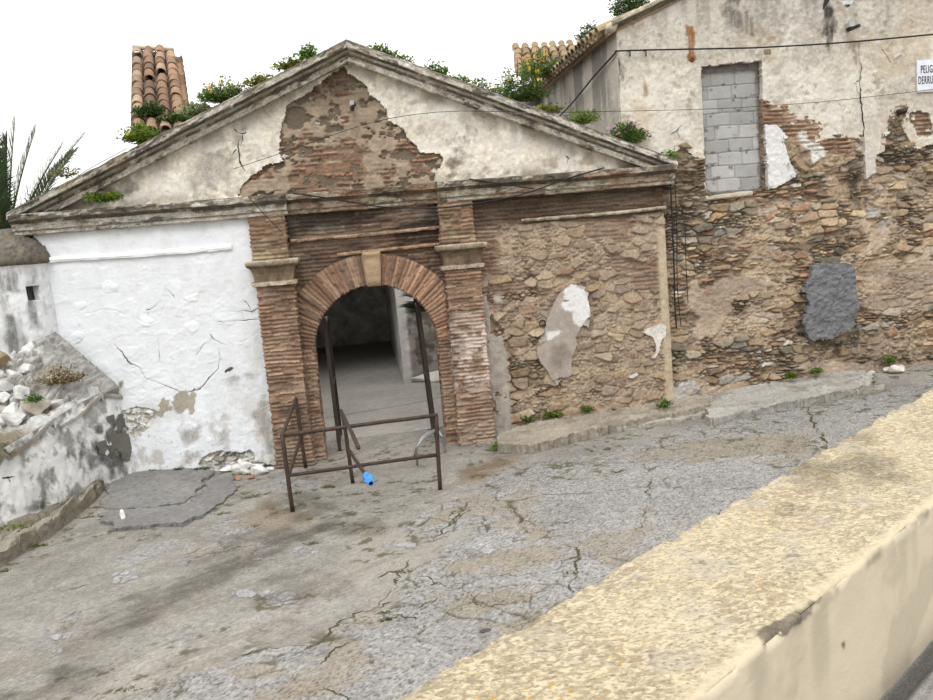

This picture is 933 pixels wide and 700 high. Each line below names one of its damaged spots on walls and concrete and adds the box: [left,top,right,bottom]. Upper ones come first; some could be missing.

rust [686,26,695,62]
water stain [824,0,834,48]
spalling [238,67,443,197]
spalling [760,100,933,190]
crack [119,301,258,393]
spalling [97,391,196,468]
crack [433,498,475,540]
crack [506,471,757,532]
crack [561,545,582,592]
crack [237,560,531,664]